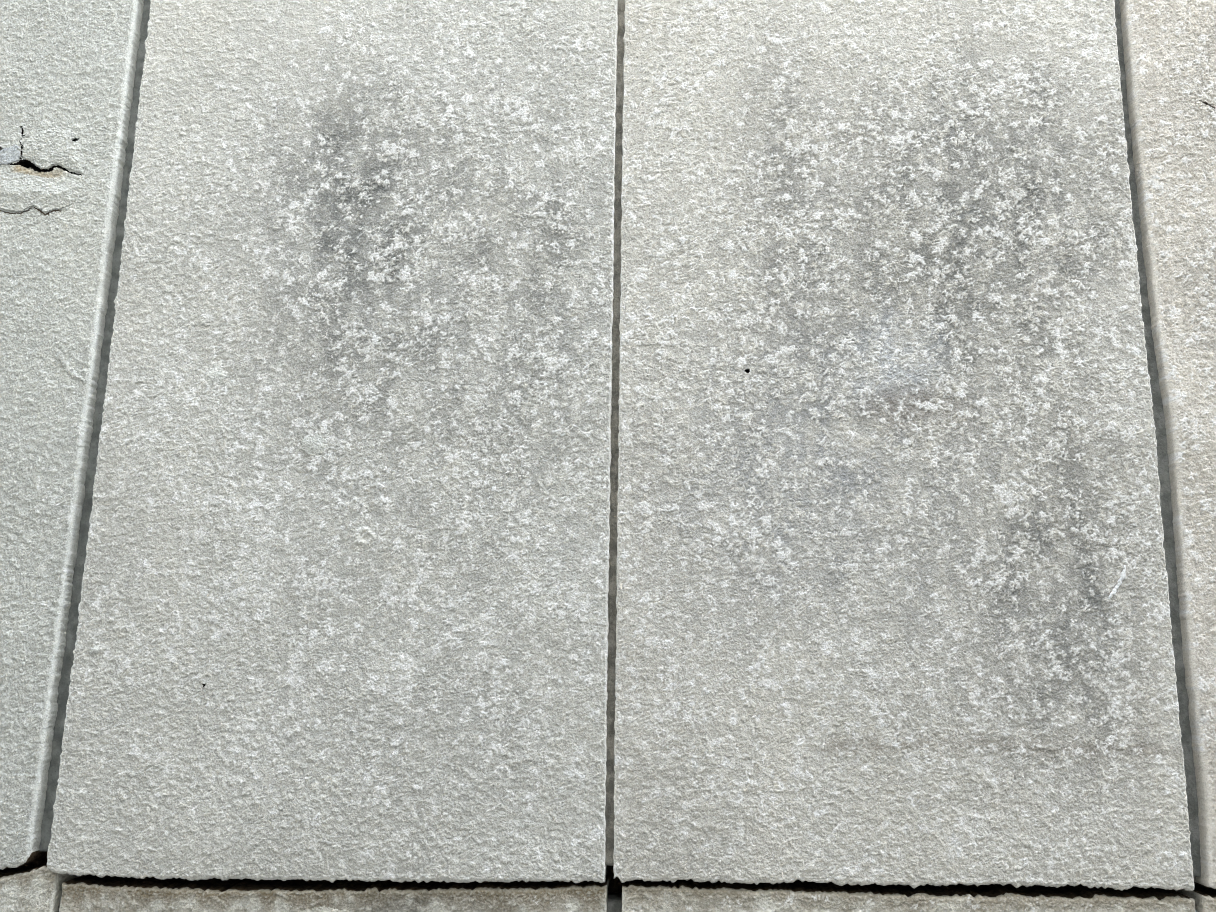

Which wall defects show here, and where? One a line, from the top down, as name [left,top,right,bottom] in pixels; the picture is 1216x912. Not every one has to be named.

peeling [0,126,85,179]